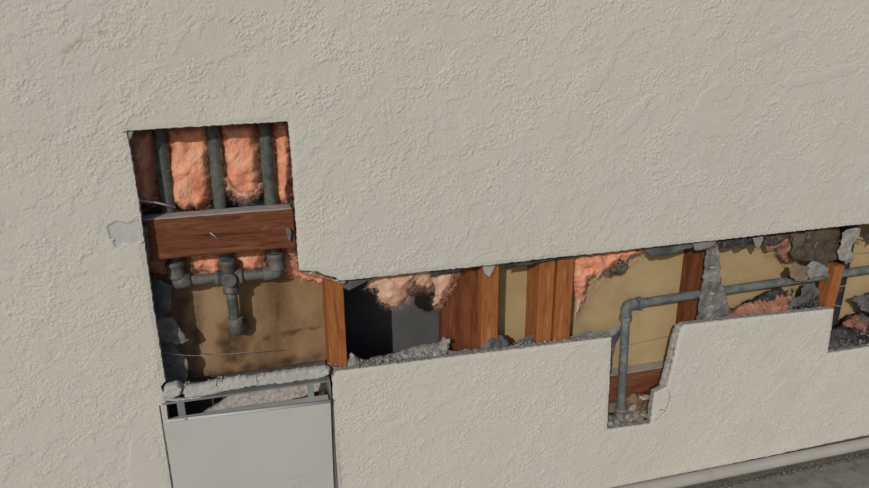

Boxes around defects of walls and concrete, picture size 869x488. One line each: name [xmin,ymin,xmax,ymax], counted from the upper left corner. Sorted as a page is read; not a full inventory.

spalling [107,131,202,419]
flaking render [481,264,497,278]
spalling [331,334,610,416]
spalling [607,306,833,430]